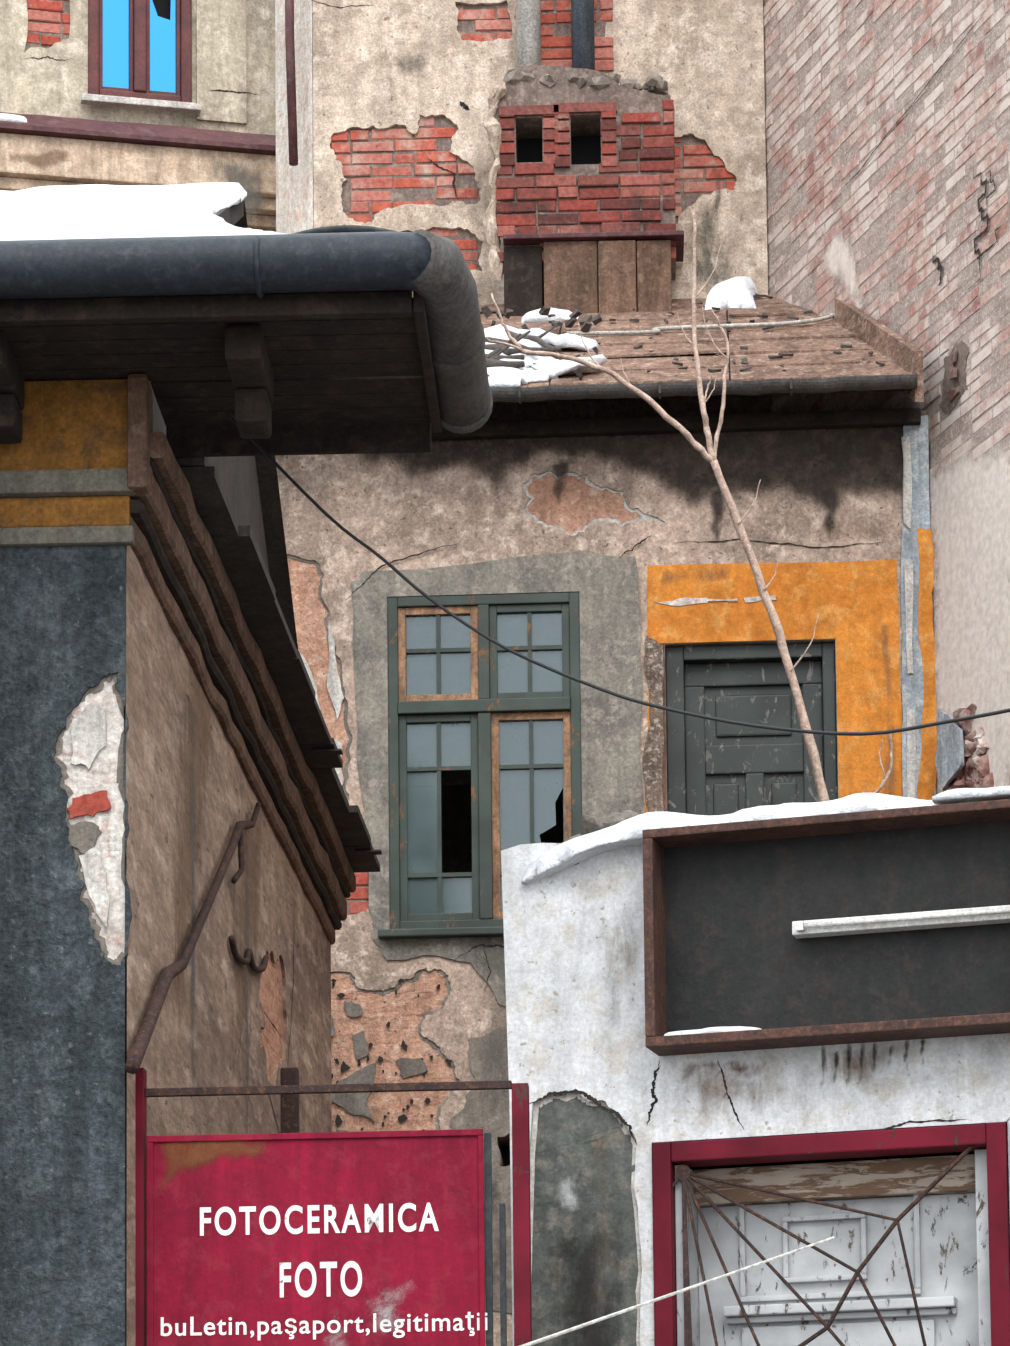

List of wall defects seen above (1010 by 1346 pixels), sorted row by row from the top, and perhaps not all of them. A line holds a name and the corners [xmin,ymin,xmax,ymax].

spalling [24,0,70,52]
spalling [330,81,506,282]
spalling [674,135,736,224]
crack [932,170,1001,289]
peeling [523,471,664,536]
peeling [901,437,1010,800]
peeling [54,673,132,965]
peeling [331,969,460,1132]
crack [718,1062,744,1129]
water stain [822,1040,924,1072]
crack [882,1119,964,1130]
water stain [561,1183,576,1205]